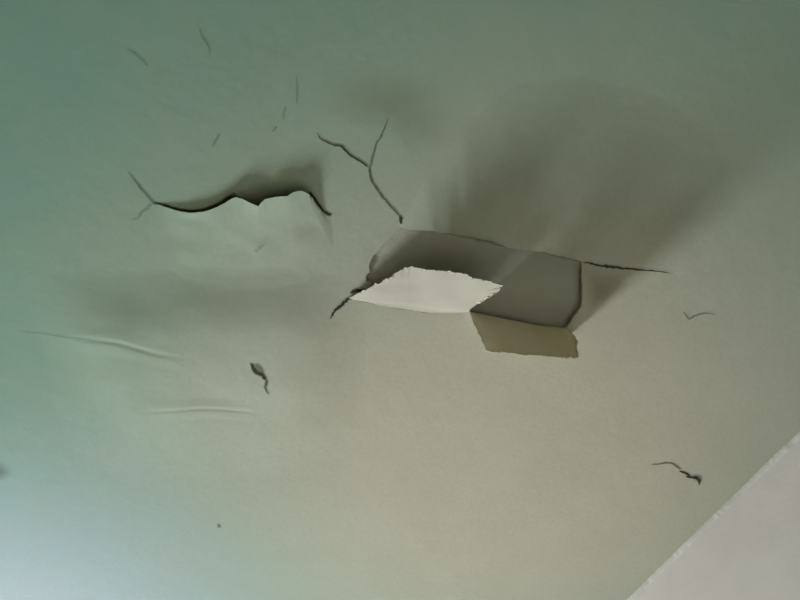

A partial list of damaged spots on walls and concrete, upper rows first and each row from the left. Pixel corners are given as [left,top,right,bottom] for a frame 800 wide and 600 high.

crack [318,134,402,224]
peeling [330,78,737,359]
crack [653,462,700,485]